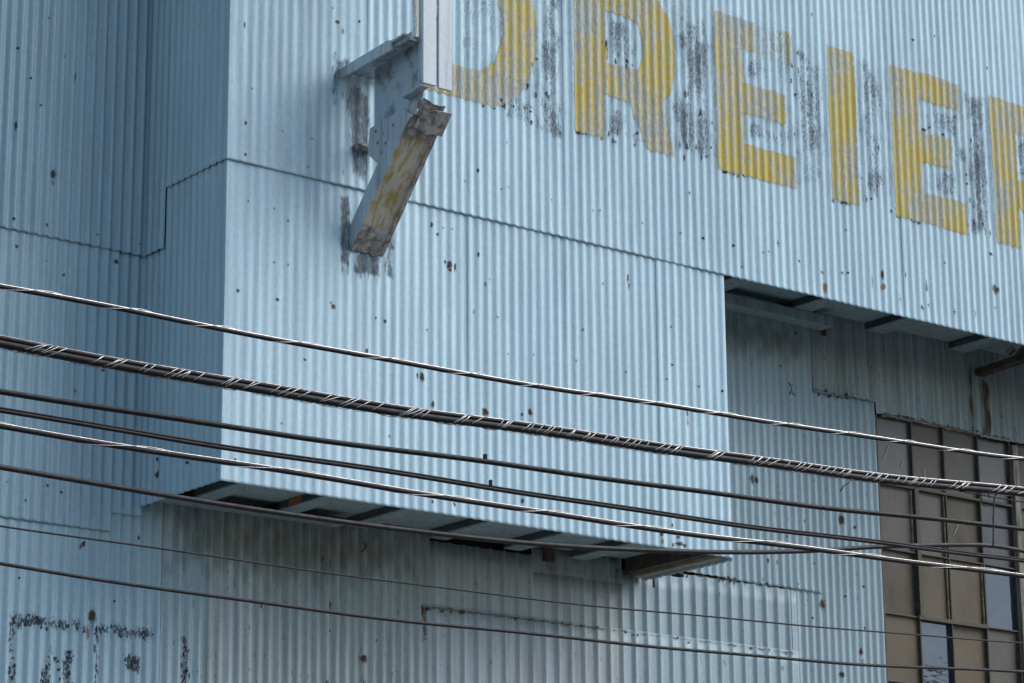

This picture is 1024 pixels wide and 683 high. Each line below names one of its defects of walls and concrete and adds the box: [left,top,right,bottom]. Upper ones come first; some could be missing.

water stain [332,53,369,179]
peeling [482,0,561,137]
peeling [672,26,713,160]
peeling [751,51,819,177]
peeling [961,101,991,235]
water stain [341,198,394,277]